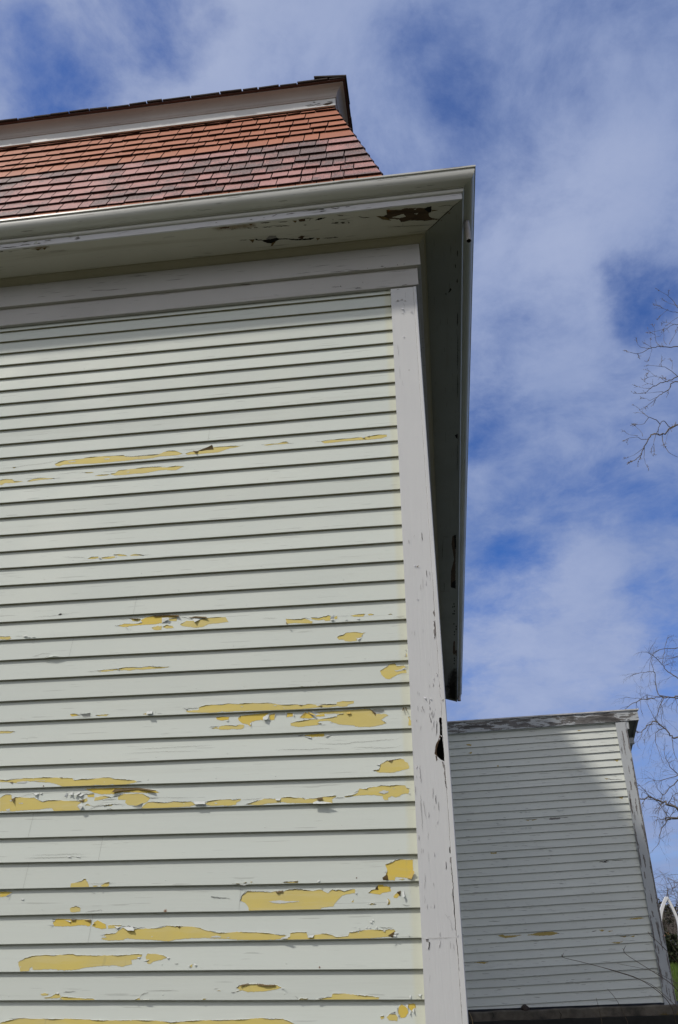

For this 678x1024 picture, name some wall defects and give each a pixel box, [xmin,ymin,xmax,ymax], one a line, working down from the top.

peeling [316,434,387,443]
peeling [0,445,240,485]
peeling [115,615,228,630]
peeling [276,613,374,642]
peeling [380,650,407,679]
peeling [185,701,388,738]
peeling [0,758,410,812]
peeling [441,713,677,1004]
peeling [236,881,355,911]
peeling [369,859,414,906]
peeling [17,906,397,971]
peeling [215,983,283,993]